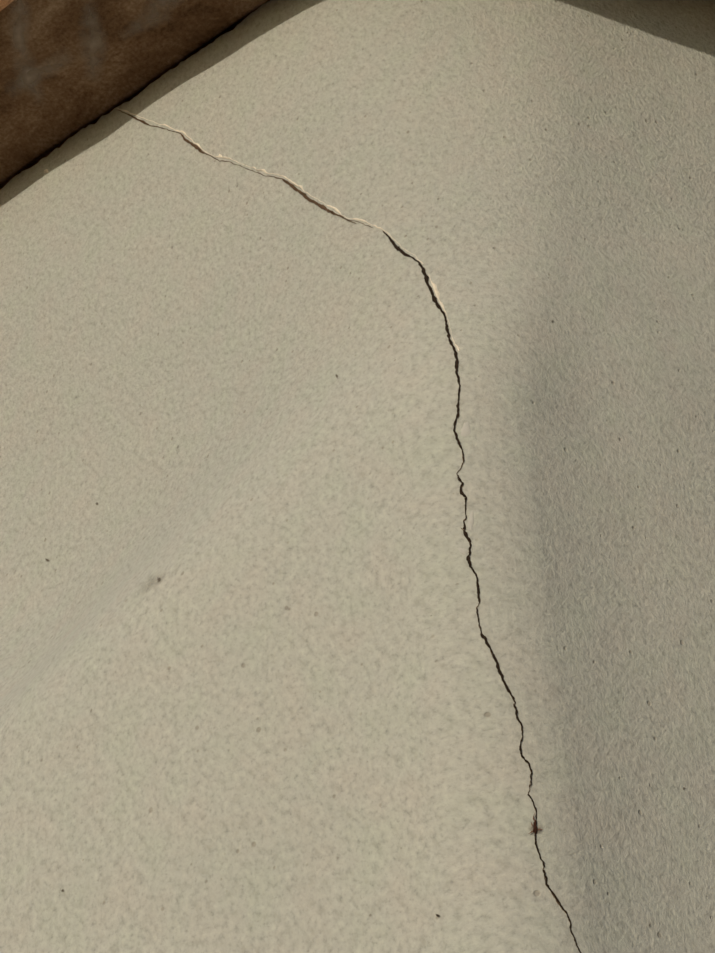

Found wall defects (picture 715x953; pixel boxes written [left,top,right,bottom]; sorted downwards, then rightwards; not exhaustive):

crack [116,108,582,953]